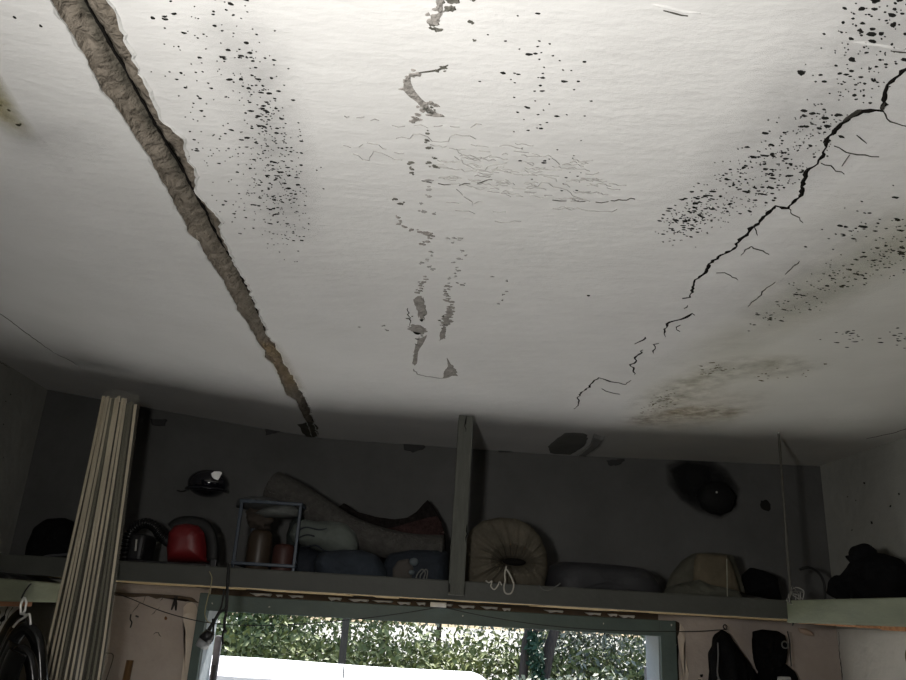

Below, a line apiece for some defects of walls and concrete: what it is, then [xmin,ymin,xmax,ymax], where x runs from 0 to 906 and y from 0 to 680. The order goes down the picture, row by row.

peeling [425,0,460,32]
water stain [812,0,906,104]
water stain [165,29,309,262]
crack [343,116,634,223]
water stain [657,99,856,246]
crack [574,68,906,409]
water stain [750,201,906,325]